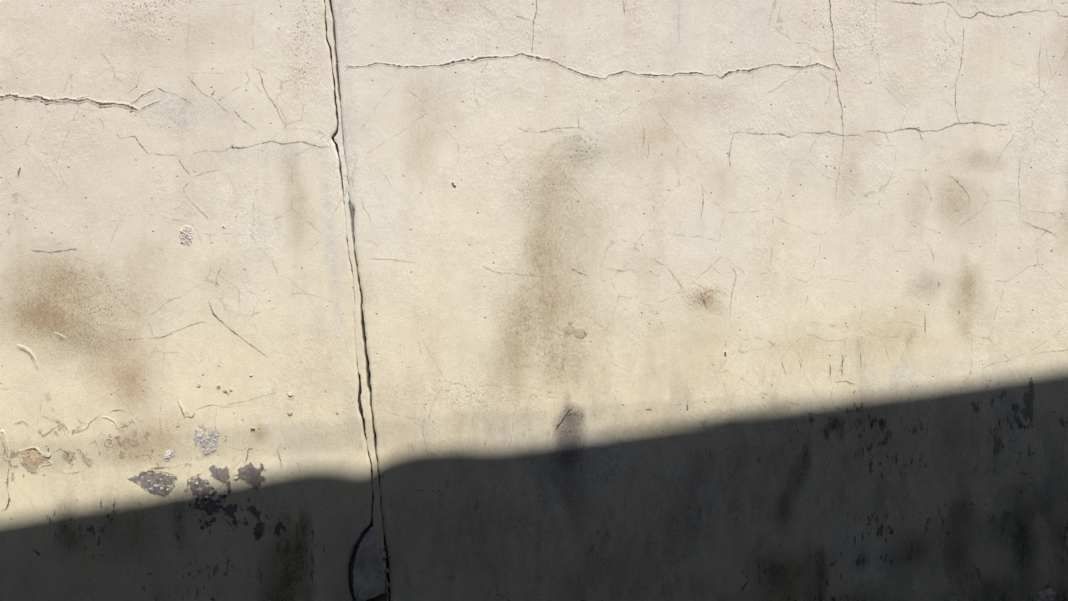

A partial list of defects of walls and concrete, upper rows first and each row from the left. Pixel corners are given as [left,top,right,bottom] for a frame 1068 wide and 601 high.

crack [0,88,187,113]
crack [324,0,845,601]
peeling [0,400,286,540]
peeling [349,525,391,601]